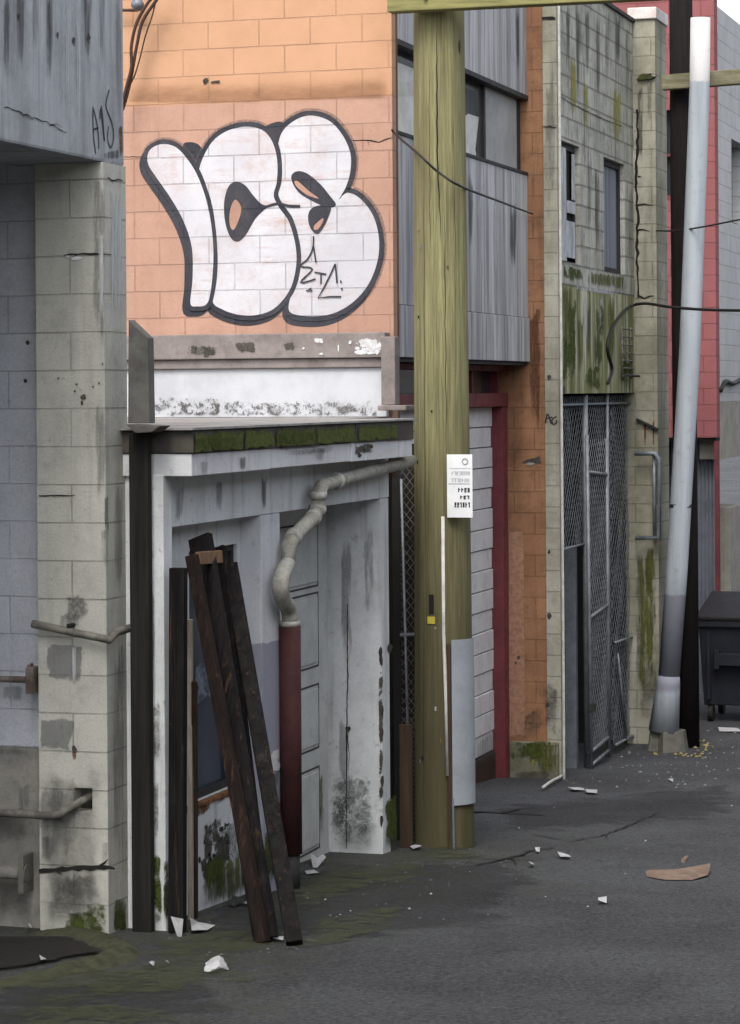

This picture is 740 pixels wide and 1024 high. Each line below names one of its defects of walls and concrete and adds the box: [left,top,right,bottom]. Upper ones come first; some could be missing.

crack [4,107,67,133]
crack [561,97,653,299]
peeling [338,338,381,355]
leakage [573,286,617,364]
peeling [155,398,377,416]
peeling [379,644,393,798]
leakage [319,775,368,831]
crack [39,859,115,875]